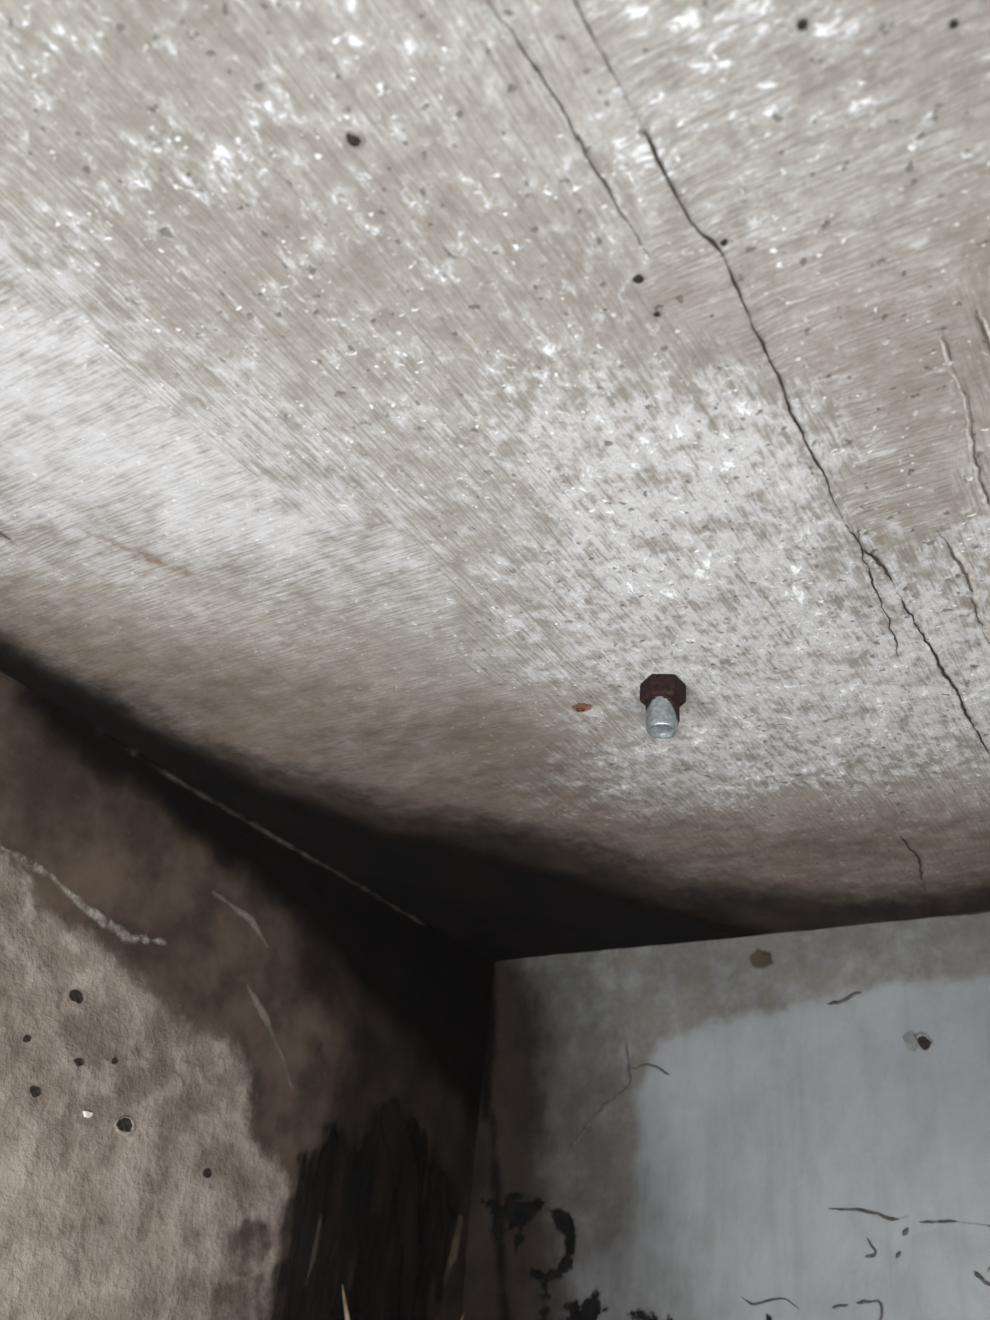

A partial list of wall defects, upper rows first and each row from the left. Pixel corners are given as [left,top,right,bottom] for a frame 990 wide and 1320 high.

crack [487,0,649,255]
crack [574,0,990,754]
rust [646,695,680,722]
leakage [0,665,990,1320]
crack [831,1208,990,1259]
crack [974,1267,990,1286]
crack [743,1298,799,1309]
crack [832,1300,883,1320]